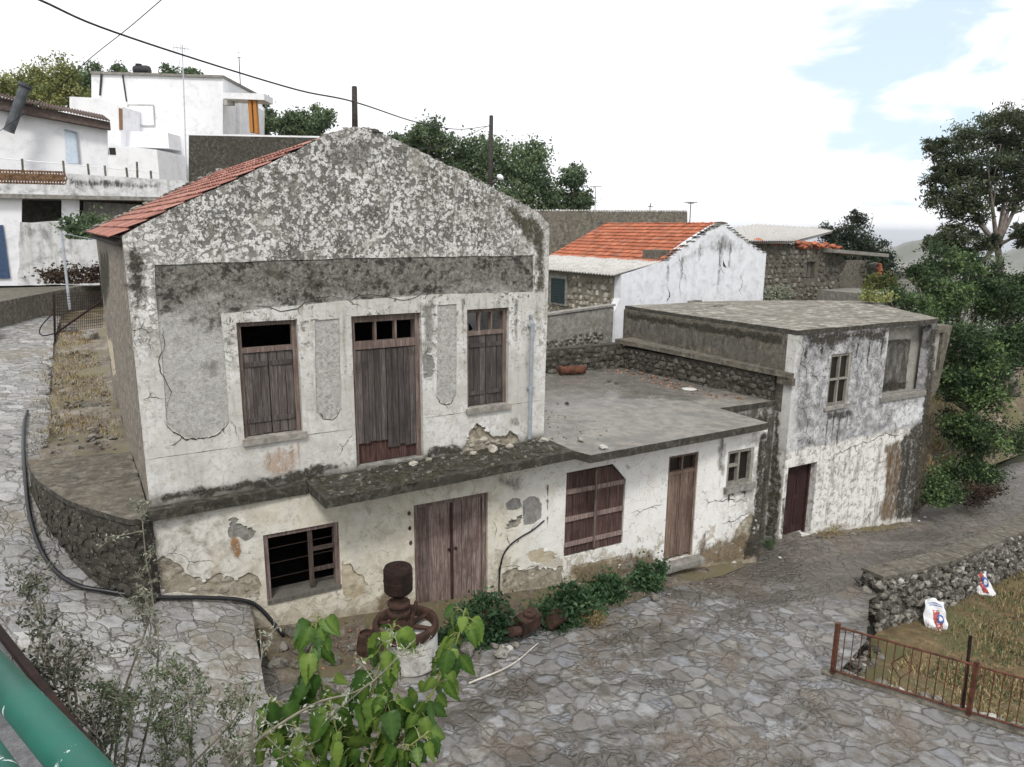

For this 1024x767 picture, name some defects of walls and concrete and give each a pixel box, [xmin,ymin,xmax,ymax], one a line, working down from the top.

damp [804,328,908,391]
crack [102,324,242,460]
flaking render [461,423,518,452]
damp [896,323,938,519]
flaking render [224,517,256,542]
flaking render [504,515,522,531]
flaking render [157,556,262,601]
flaking render [502,548,622,593]